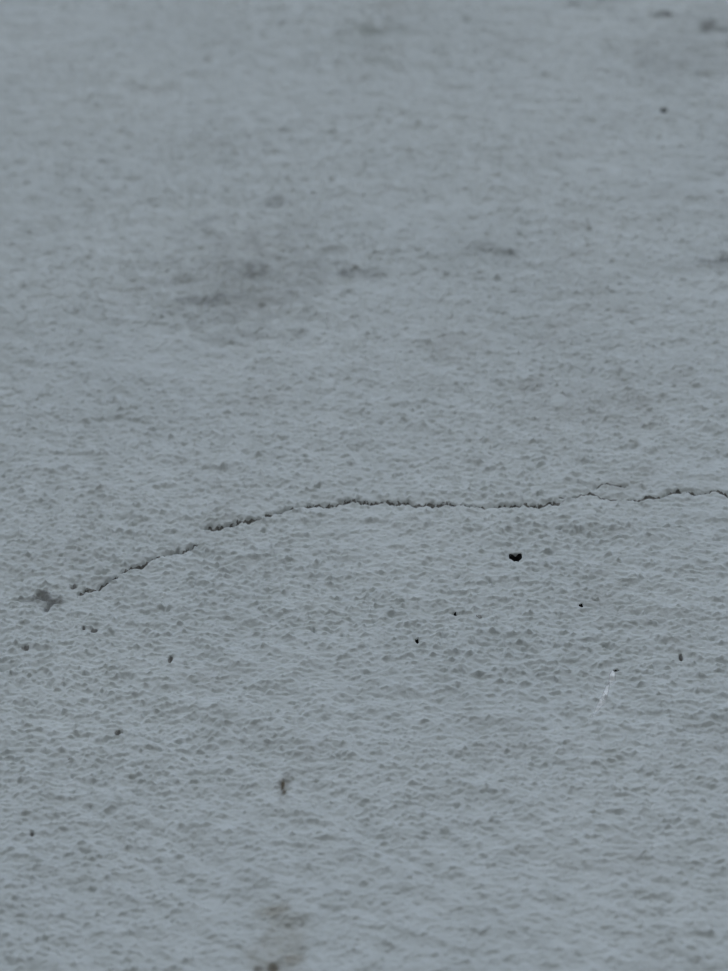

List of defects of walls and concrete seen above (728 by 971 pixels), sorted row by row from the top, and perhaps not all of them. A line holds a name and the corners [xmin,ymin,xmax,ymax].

crack [79,483,728,596]